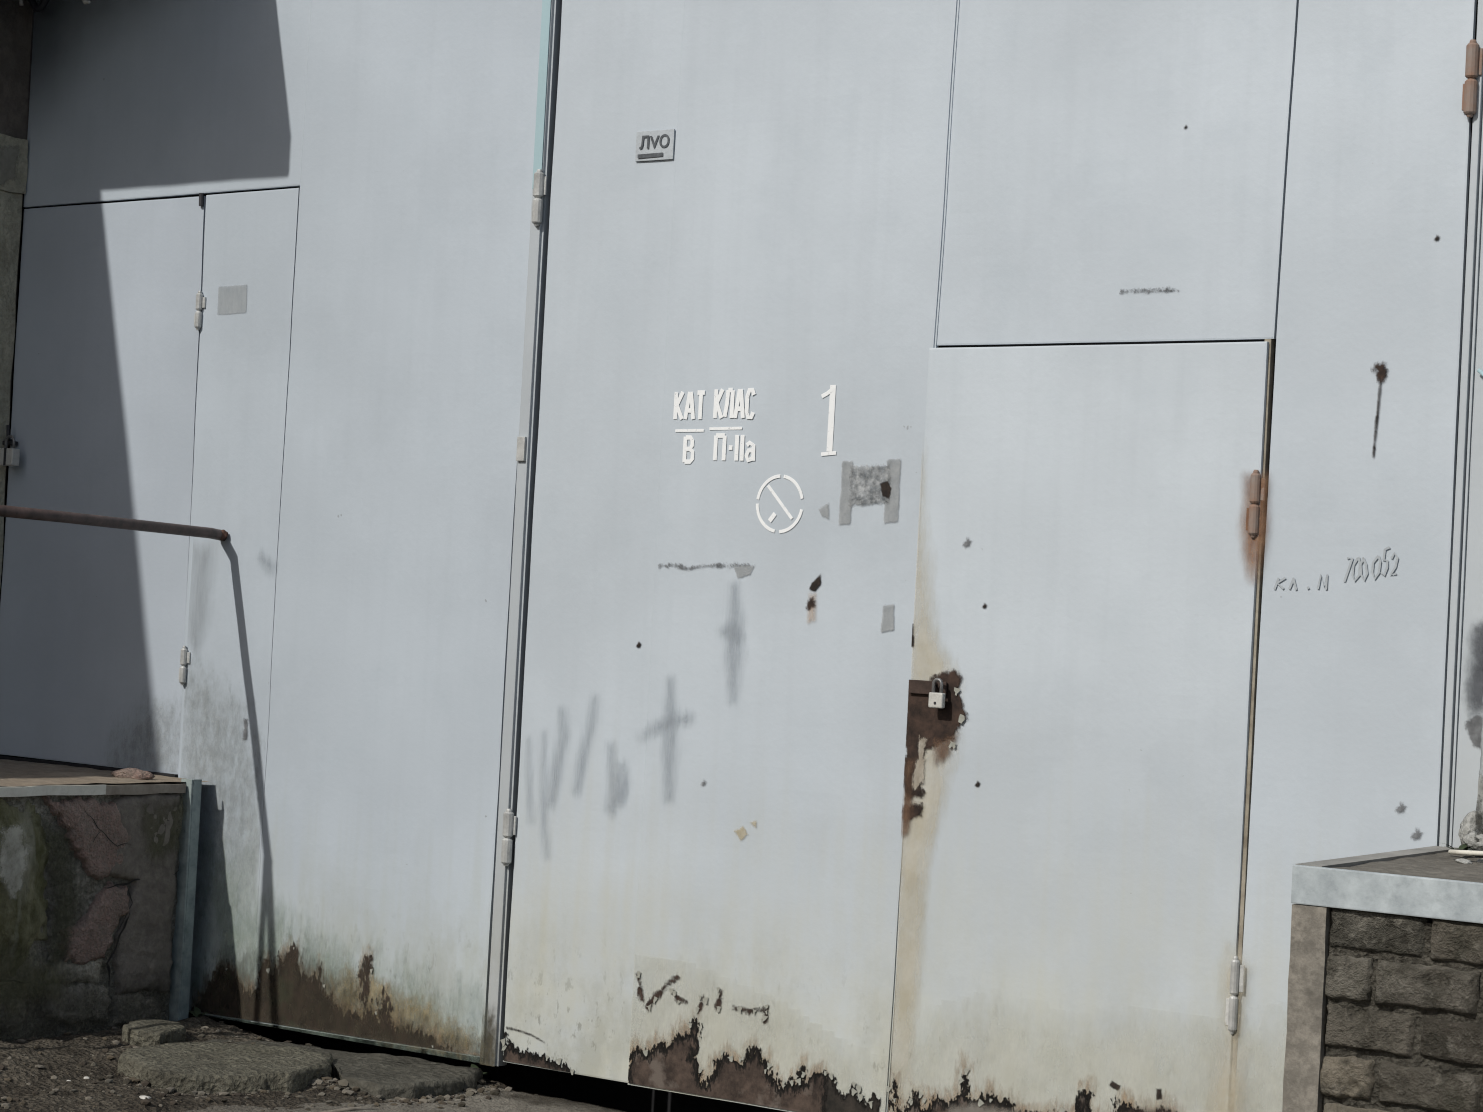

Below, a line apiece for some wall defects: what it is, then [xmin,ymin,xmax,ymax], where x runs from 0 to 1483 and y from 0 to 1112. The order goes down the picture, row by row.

corrosion [1372,362,1388,457]
corrosion [1244,479,1264,567]
corrosion [806,575,821,610]
corrosion [894,624,968,1112]
corrosion [192,941,475,1055]
peeling [500,1031,578,1075]
peeling [628,971,1212,1112]